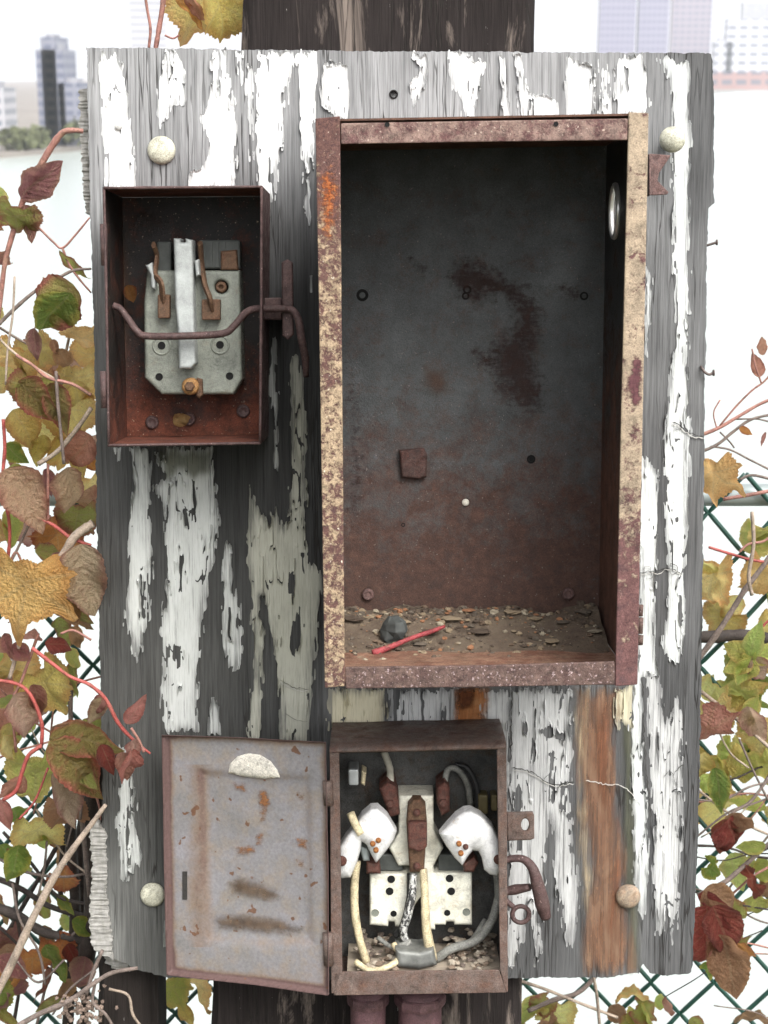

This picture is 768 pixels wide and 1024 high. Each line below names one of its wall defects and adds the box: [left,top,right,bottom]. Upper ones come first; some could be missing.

peeling [99,51,136,187]
peeling [188,47,349,226]
rust [322,173,337,236]
rust [627,356,642,406]
peeling [113,337,322,741]
peeling [499,52,693,945]
peeling [115,774,142,882]
rust [233,882,276,898]
rust [219,917,291,931]
peeling [479,686,581,968]
crack [510,682,683,829]
rust [578,691,633,974]